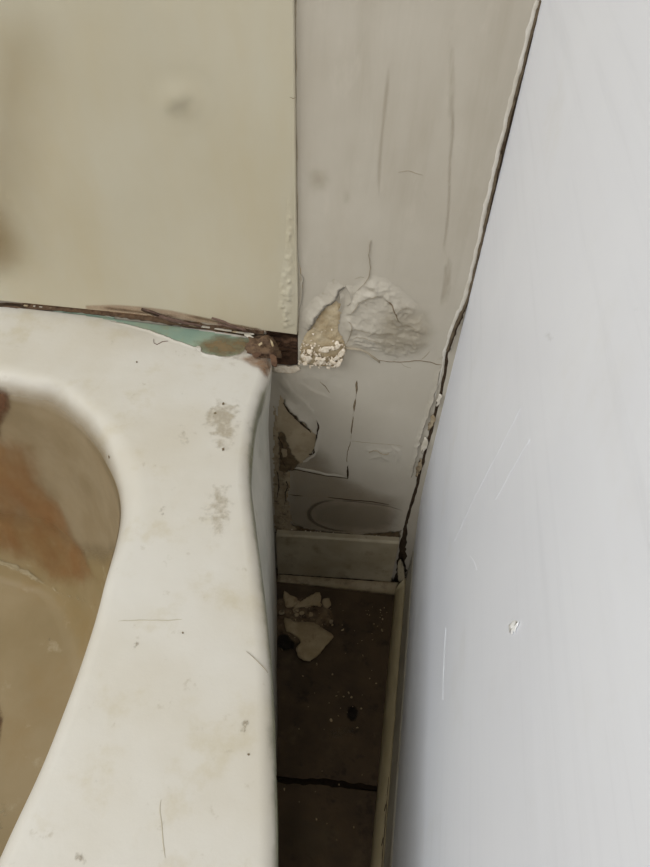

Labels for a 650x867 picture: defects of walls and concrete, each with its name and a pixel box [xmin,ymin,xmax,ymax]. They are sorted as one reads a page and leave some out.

flaking render [267,255,353,369]
crack [294,0,542,582]
peeling [272,395,324,531]